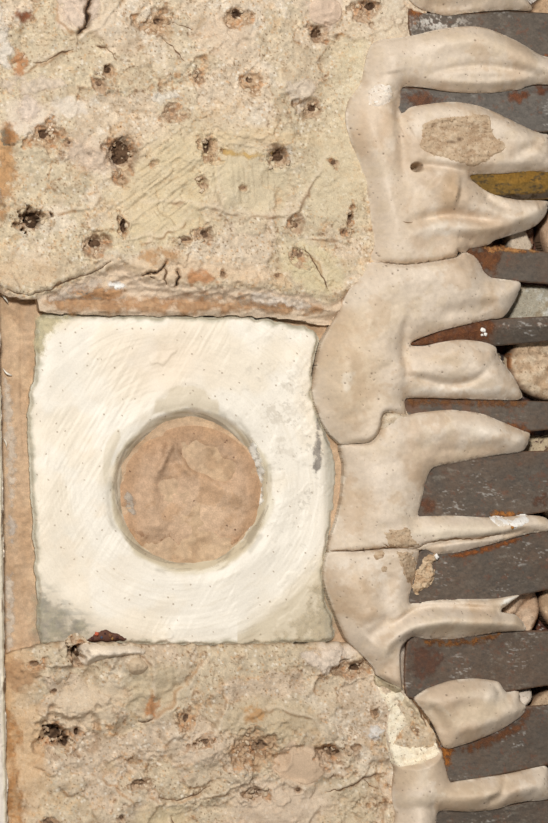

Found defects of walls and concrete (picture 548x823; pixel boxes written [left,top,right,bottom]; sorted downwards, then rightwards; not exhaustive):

crack [14,0,91,63]
corrosion [408,92,436,106]
spalling [419,113,506,167]
corrosion [411,320,495,345]
spalling [373,527,439,587]
corrosion [441,711,530,765]